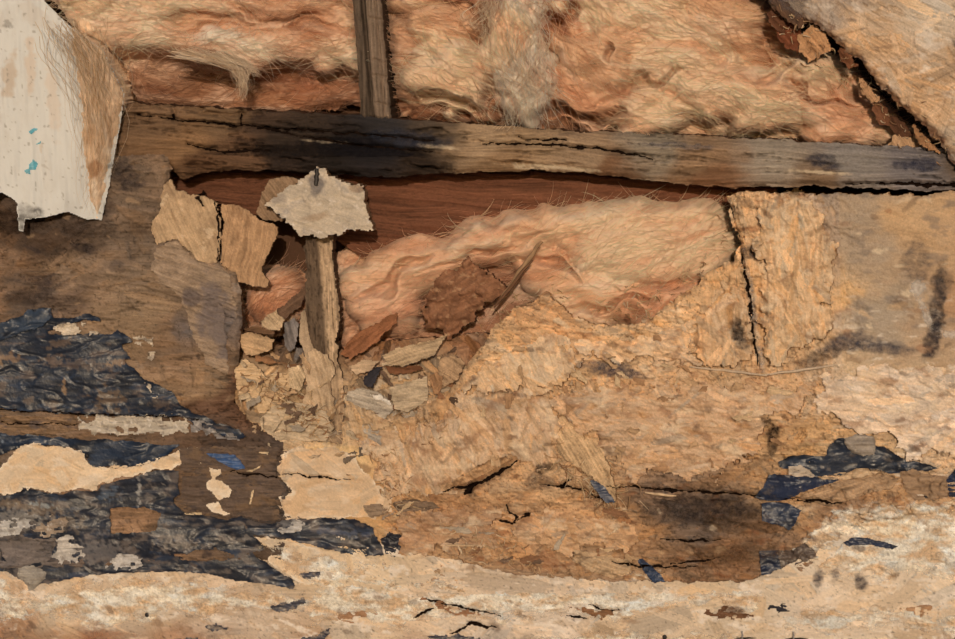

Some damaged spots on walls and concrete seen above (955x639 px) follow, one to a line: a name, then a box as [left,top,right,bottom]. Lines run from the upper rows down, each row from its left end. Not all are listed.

spalling [766,0,941,154]
crack [731,206,758,365]
peeling [0,179,955,634]